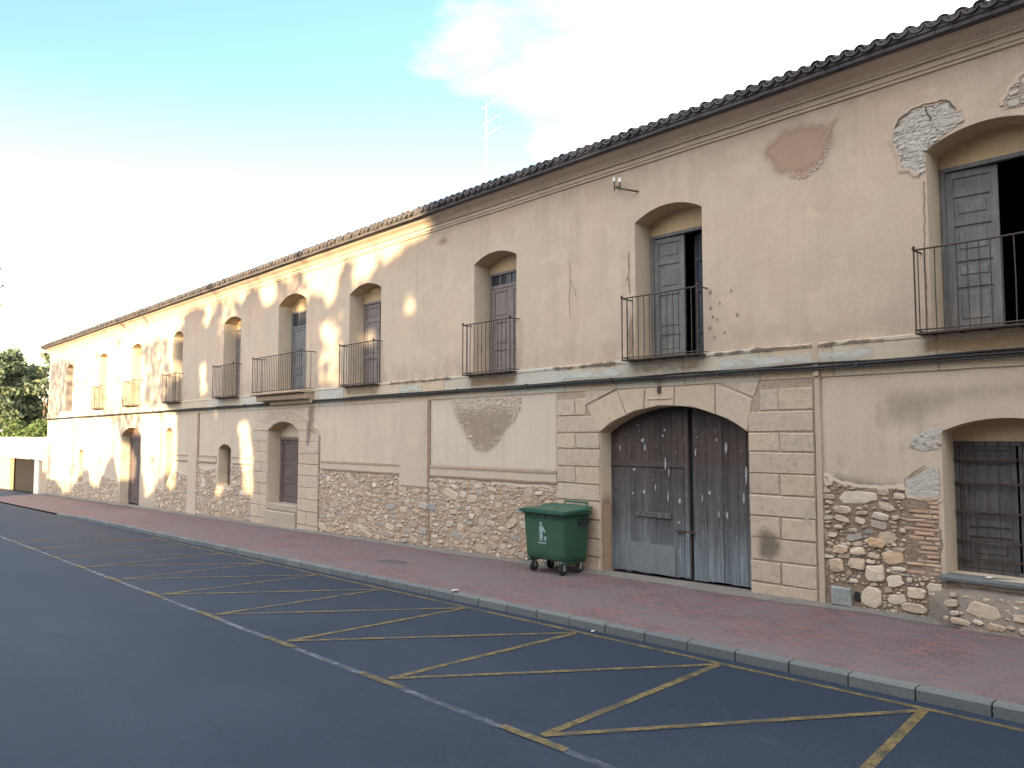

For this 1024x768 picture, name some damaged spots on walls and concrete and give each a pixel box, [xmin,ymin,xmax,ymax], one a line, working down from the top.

flaking render [999,71,1024,110]
flaking render [766,121,834,179]
flaking render [888,97,964,179]
flaking render [451,396,521,452]
flaking render [909,428,944,451]
damp [761,532,777,556]